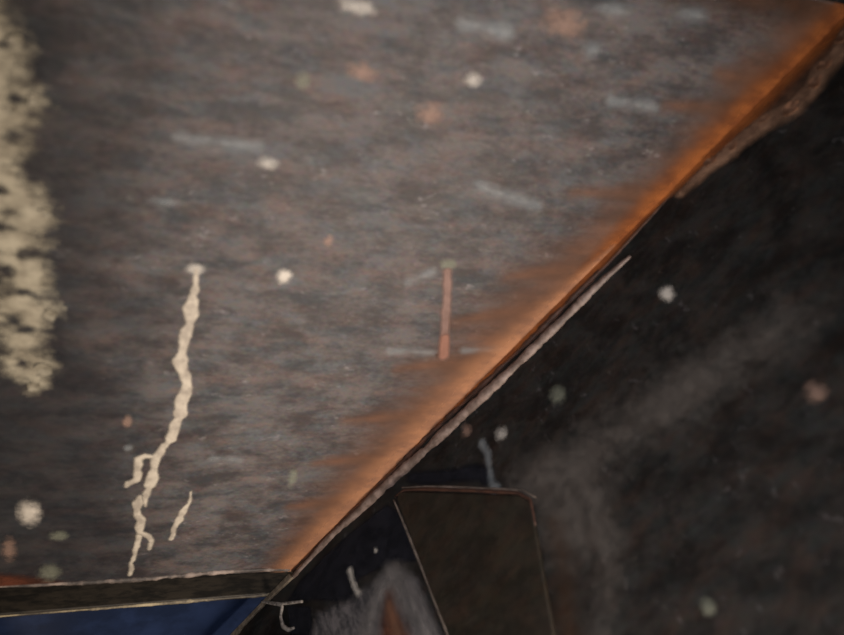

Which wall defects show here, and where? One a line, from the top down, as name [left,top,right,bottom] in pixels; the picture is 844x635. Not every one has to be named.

crack [125,266,200,576]
rust [276,3,844,572]